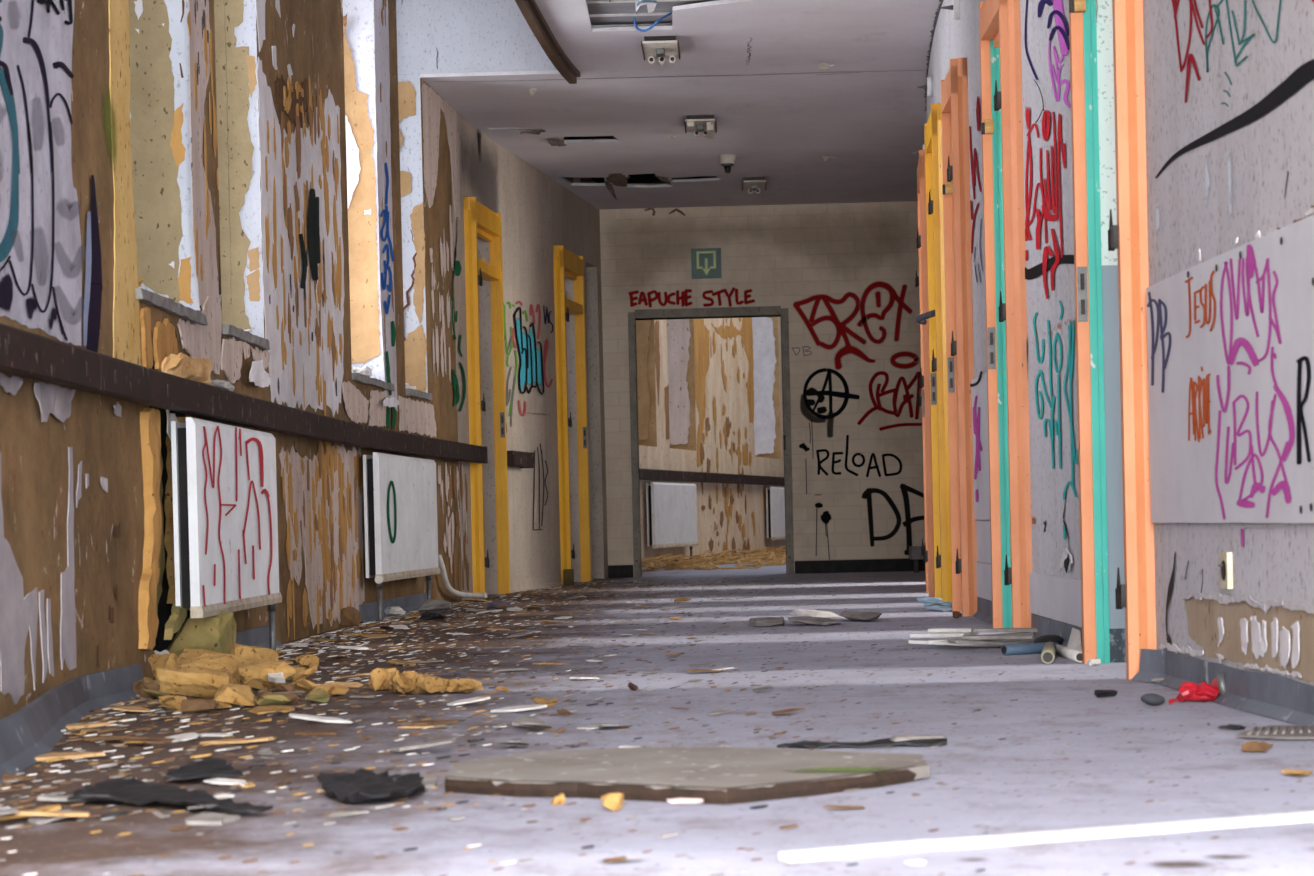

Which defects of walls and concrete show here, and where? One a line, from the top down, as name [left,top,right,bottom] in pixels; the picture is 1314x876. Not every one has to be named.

peeling [108,0,461,438]
peeling [0,372,76,422]
peeling [636,317,776,557]
peeling [0,447,108,705]
flaking render [329,673,376,698]
peeling [278,440,430,660]
peeling [438,463,572,638]
peeling [1159,592,1314,683]